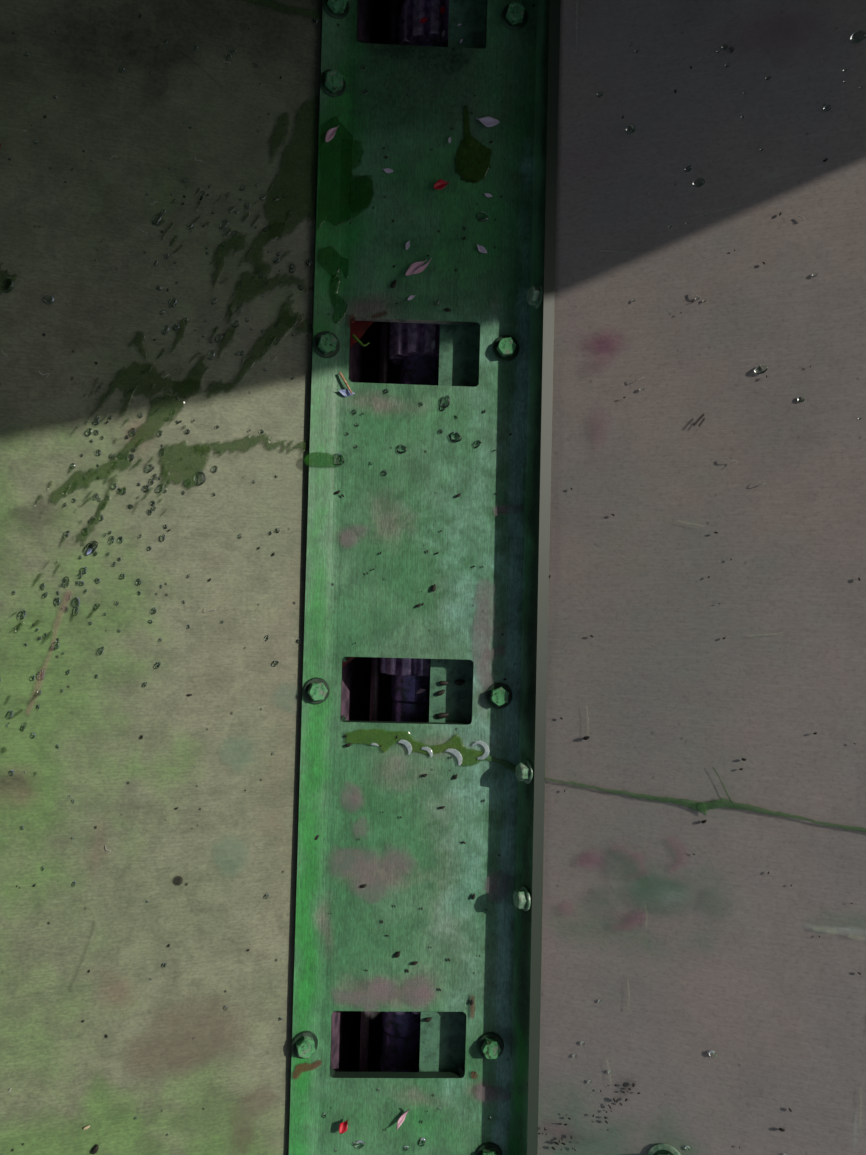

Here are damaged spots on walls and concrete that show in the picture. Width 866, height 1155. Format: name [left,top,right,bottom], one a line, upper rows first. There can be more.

water stain [36,97,374,546]
water stain [345,729,516,773]